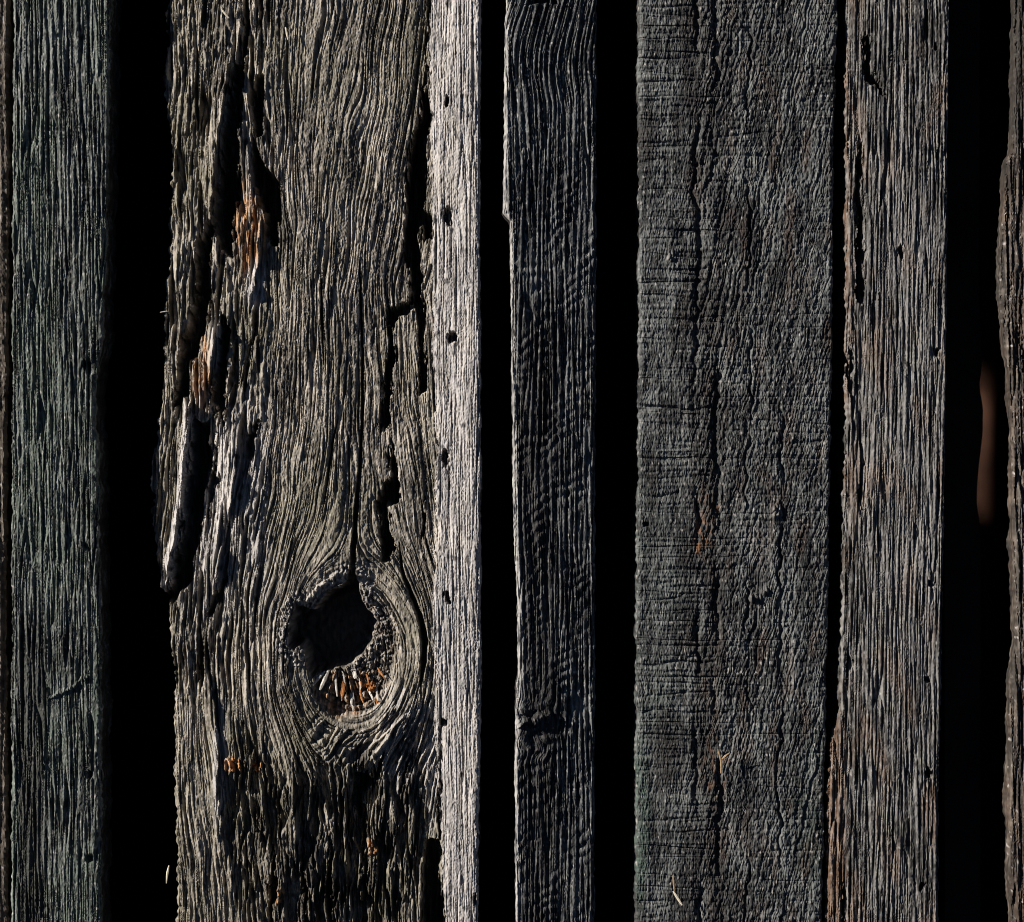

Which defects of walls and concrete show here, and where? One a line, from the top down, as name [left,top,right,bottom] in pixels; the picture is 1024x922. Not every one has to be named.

crack [194,645,206,698]
crack [170,0,282,619]
crack [251,0,449,922]